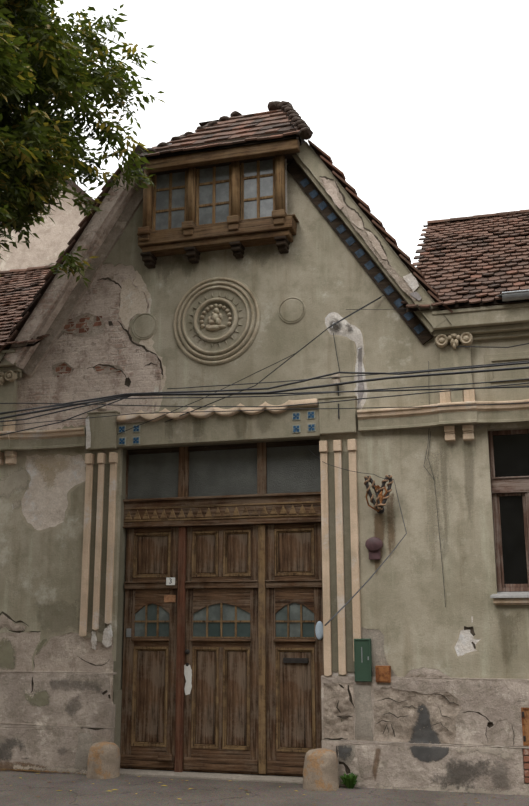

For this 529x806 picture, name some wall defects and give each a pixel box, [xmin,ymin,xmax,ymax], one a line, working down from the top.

flaking render [15,263,166,533]
flaking render [33,624,114,705]
flaking render [451,616,484,658]
water stain [0,738,86,773]
water stain [377,705,529,796]
crack [462,711,515,745]